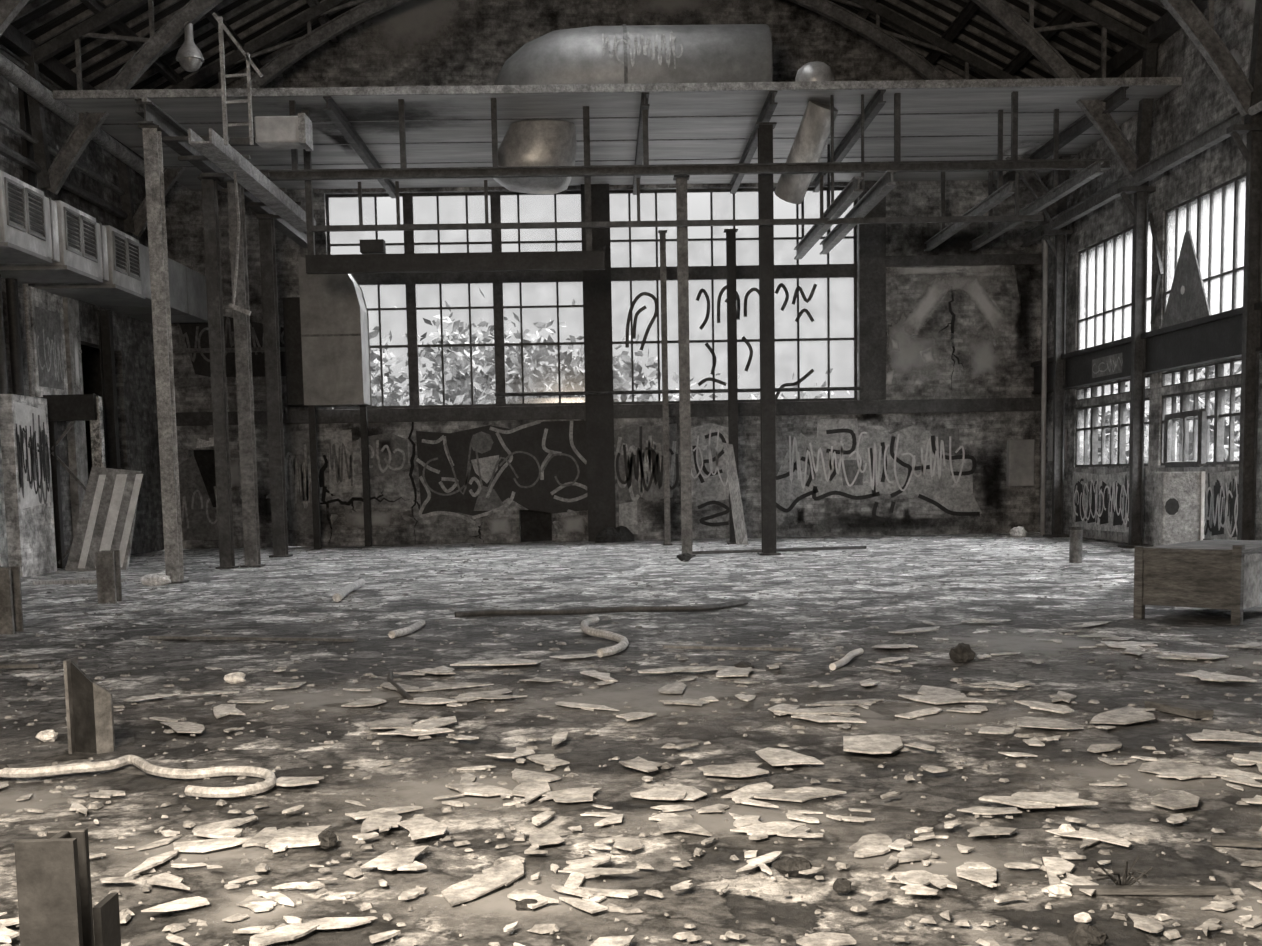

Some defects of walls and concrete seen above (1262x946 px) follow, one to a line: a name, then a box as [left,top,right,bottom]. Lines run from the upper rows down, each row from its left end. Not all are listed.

peeling [124,619,1262,773]
peeling [0,912,19,943]
peeling [0,781,125,824]
peeling [89,805,400,946]
peeling [275,776,324,786]
peeling [342,729,1262,946]